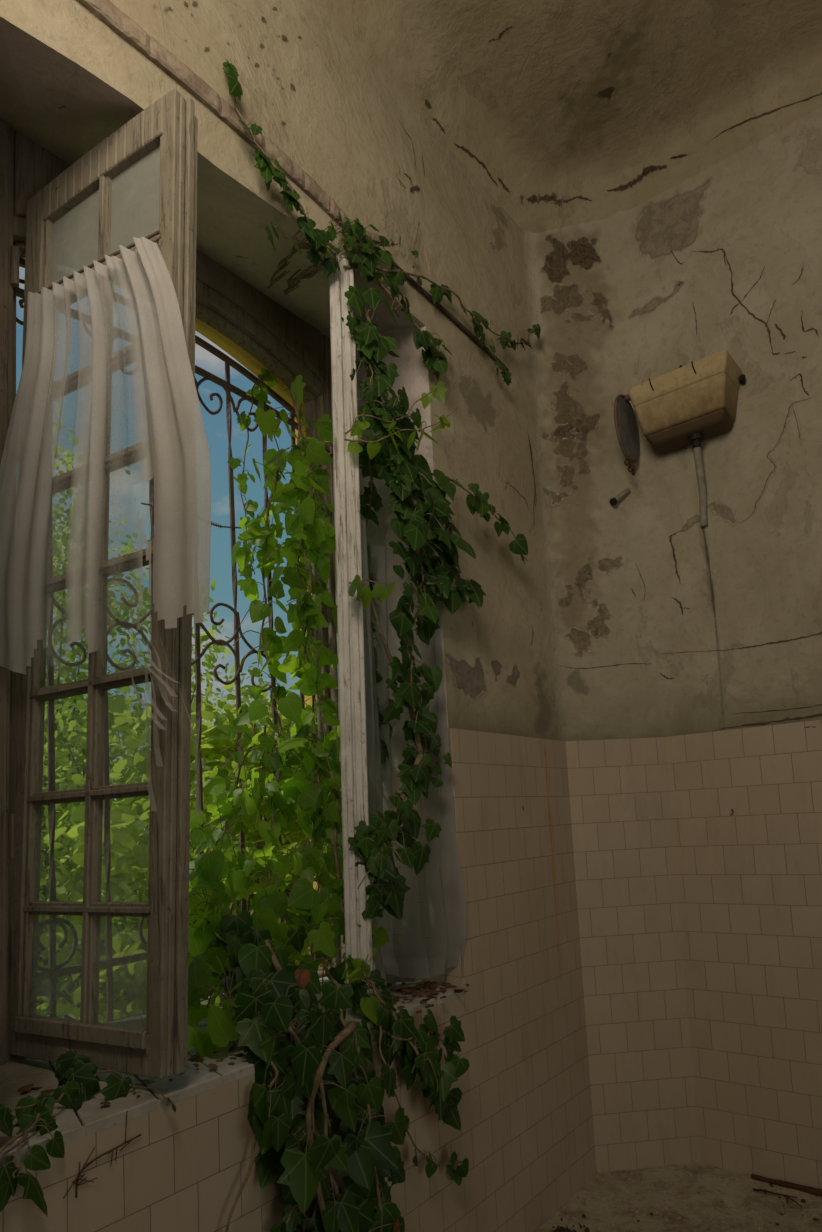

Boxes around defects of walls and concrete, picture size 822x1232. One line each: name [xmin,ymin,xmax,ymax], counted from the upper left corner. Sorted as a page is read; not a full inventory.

crack [713,93,822,139]
crack [398,100,687,203]
flaking render [540,235,614,329]
flaking render [630,281,684,317]
crack [670,248,819,396]
crack [556,632,822,669]
flaking render [446,652,519,698]